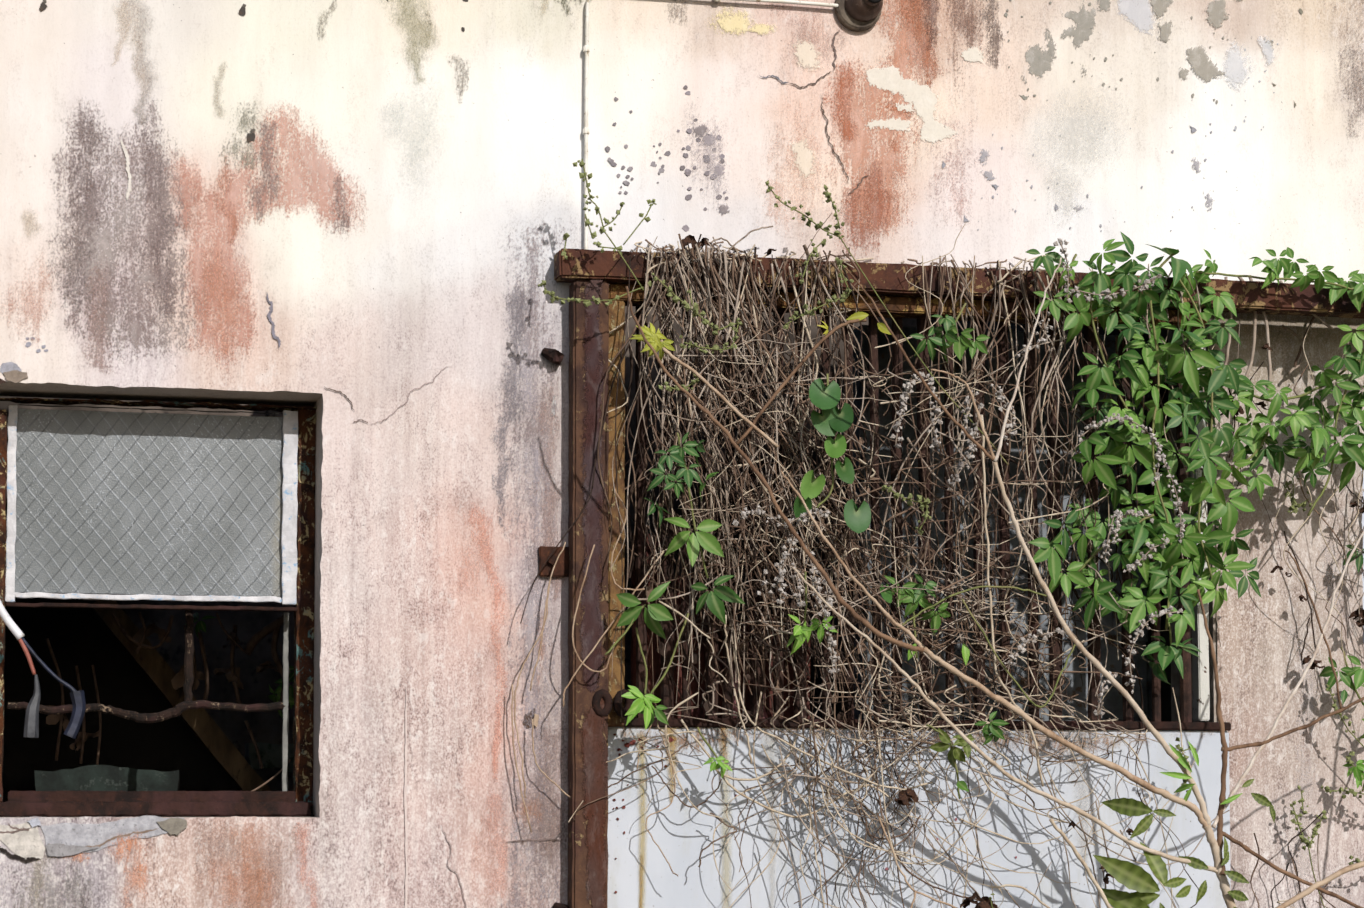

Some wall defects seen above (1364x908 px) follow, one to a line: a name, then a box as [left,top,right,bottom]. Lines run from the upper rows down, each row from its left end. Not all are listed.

damp [48,10,205,368]
crack [760,32,870,195]
corrosion [799,0,941,252]
peeling [865,65,959,144]
peeling [1008,0,1174,101]
peeling [1179,0,1278,131]
crack [324,366,450,424]
damp [492,223,563,908]
corrosion [580,279,609,908]
spalling [0,815,187,863]
corrosion [623,727,766,908]
corrosion [972,729,1120,759]